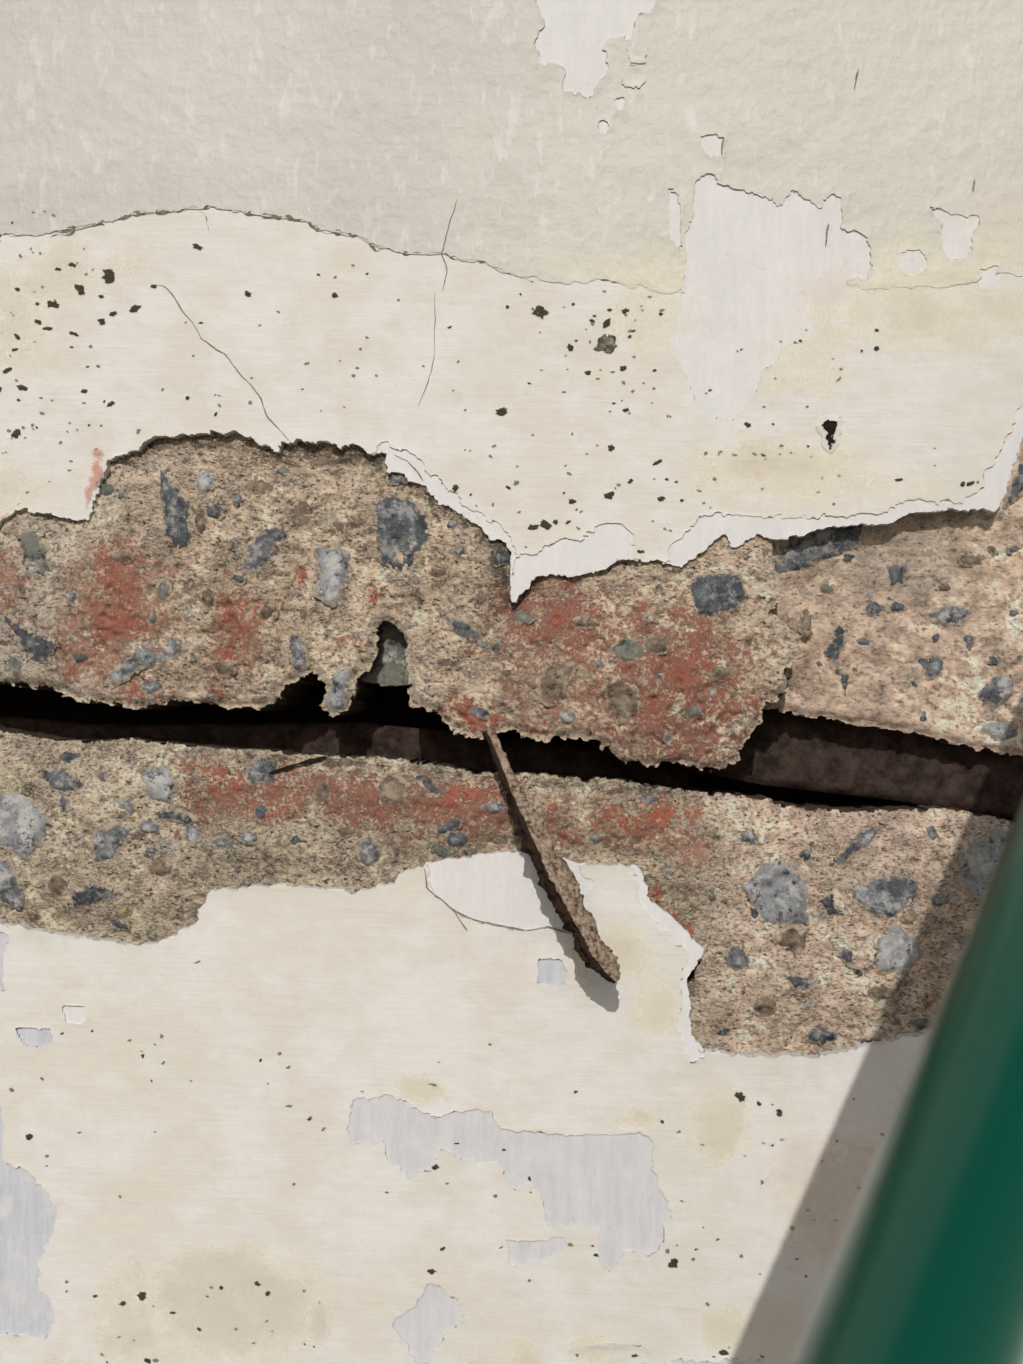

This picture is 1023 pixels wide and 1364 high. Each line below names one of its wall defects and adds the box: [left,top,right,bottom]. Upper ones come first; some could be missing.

peeling [535,0,657,110]
crack [151,284,288,439]
crack [0,200,533,403]
spalling [593,334,617,354]
rust [0,534,185,703]
rust [202,570,276,700]
rust [292,565,308,588]
rust [175,755,513,850]
spalling [0,405,1023,1062]
crack [0,681,1023,821]
peeling [0,1106,57,1338]
peeling [347,1094,671,1271]